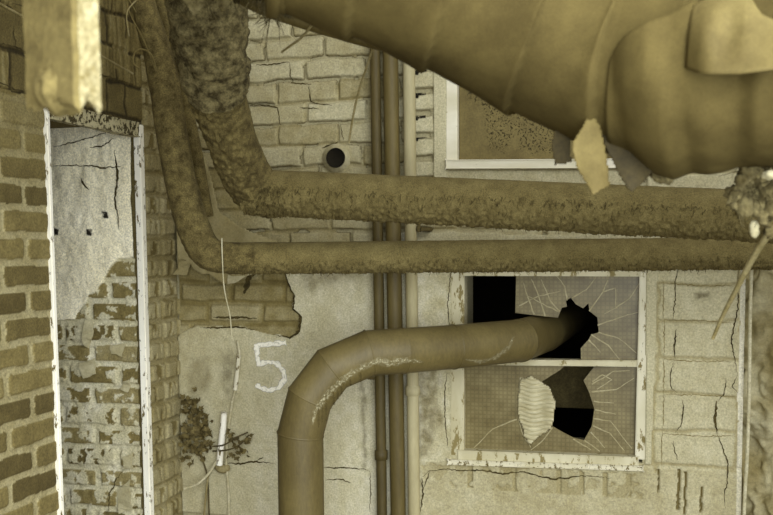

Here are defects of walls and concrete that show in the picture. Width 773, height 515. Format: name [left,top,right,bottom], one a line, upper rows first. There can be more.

crack [52,132,120,229]
flaking render [203,156,277,242]
spalling [173,230,302,339]
flaking render [79,358,96,378]
crack [661,269,739,508]
crack [420,468,607,512]